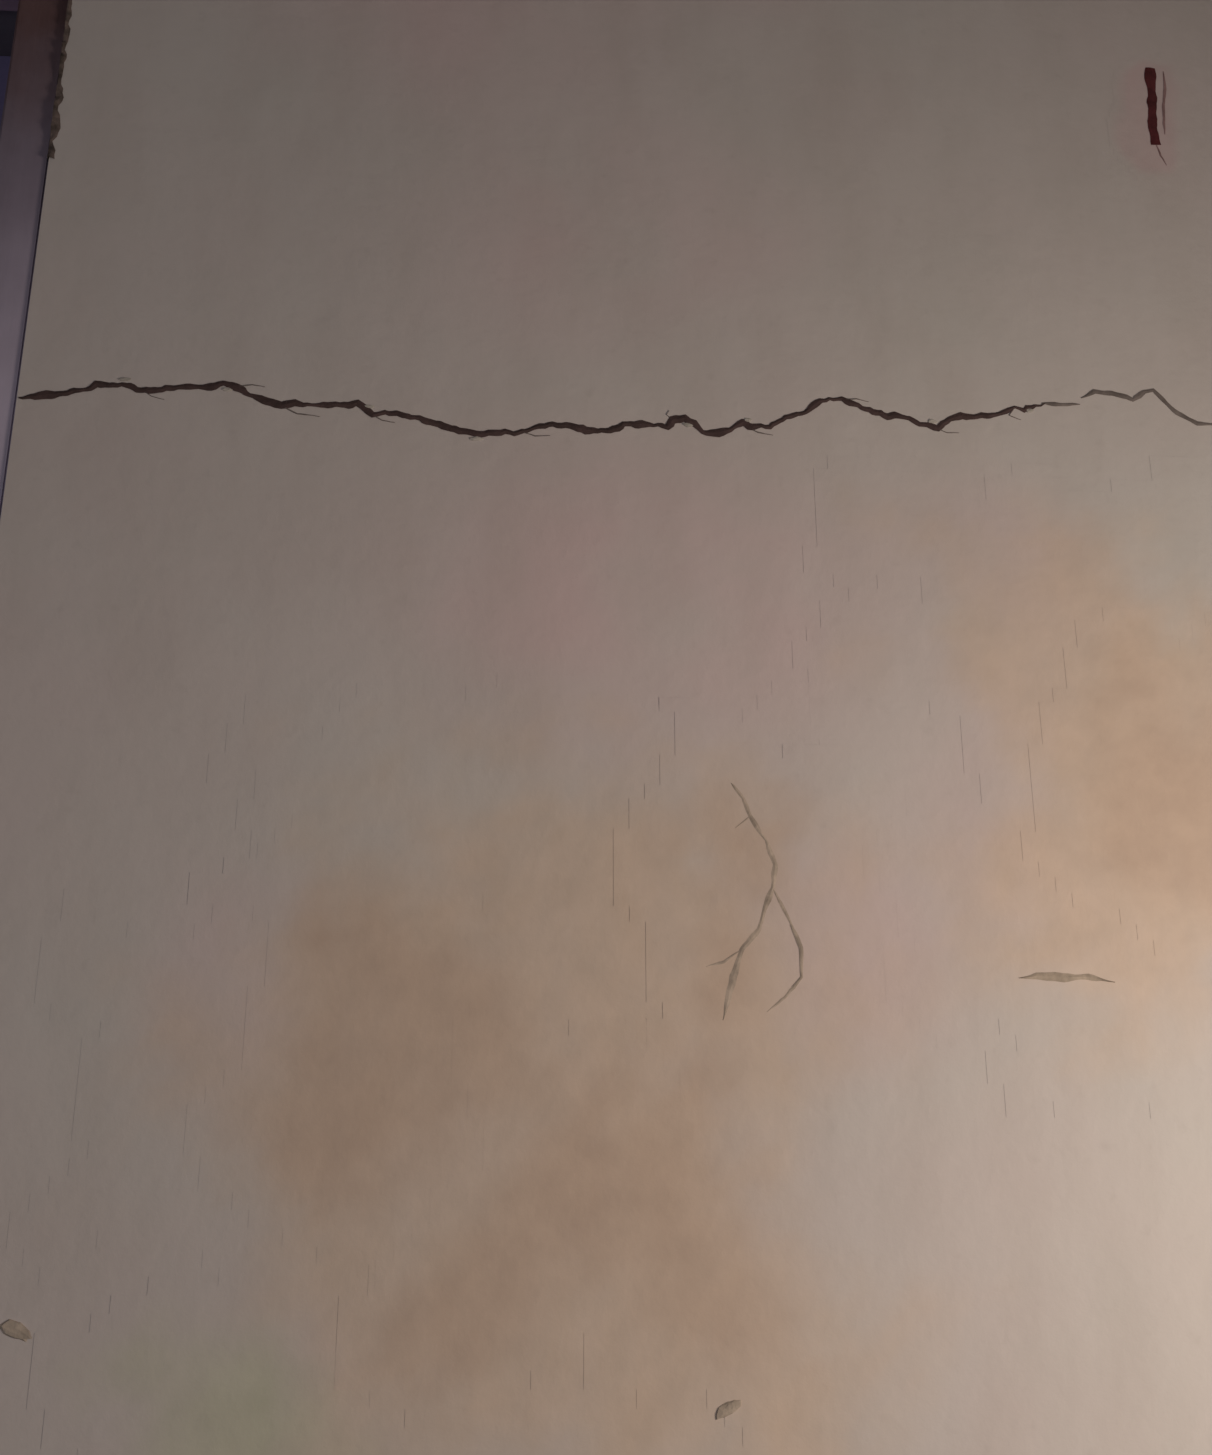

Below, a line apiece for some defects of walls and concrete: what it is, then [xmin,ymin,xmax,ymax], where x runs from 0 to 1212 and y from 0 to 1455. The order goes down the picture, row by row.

flaking render [47,0,72,161]
rust [1107,54,1189,180]
crack [18,377,1212,441]
leakage [6,456,1212,1455]
crack [706,783,803,1020]